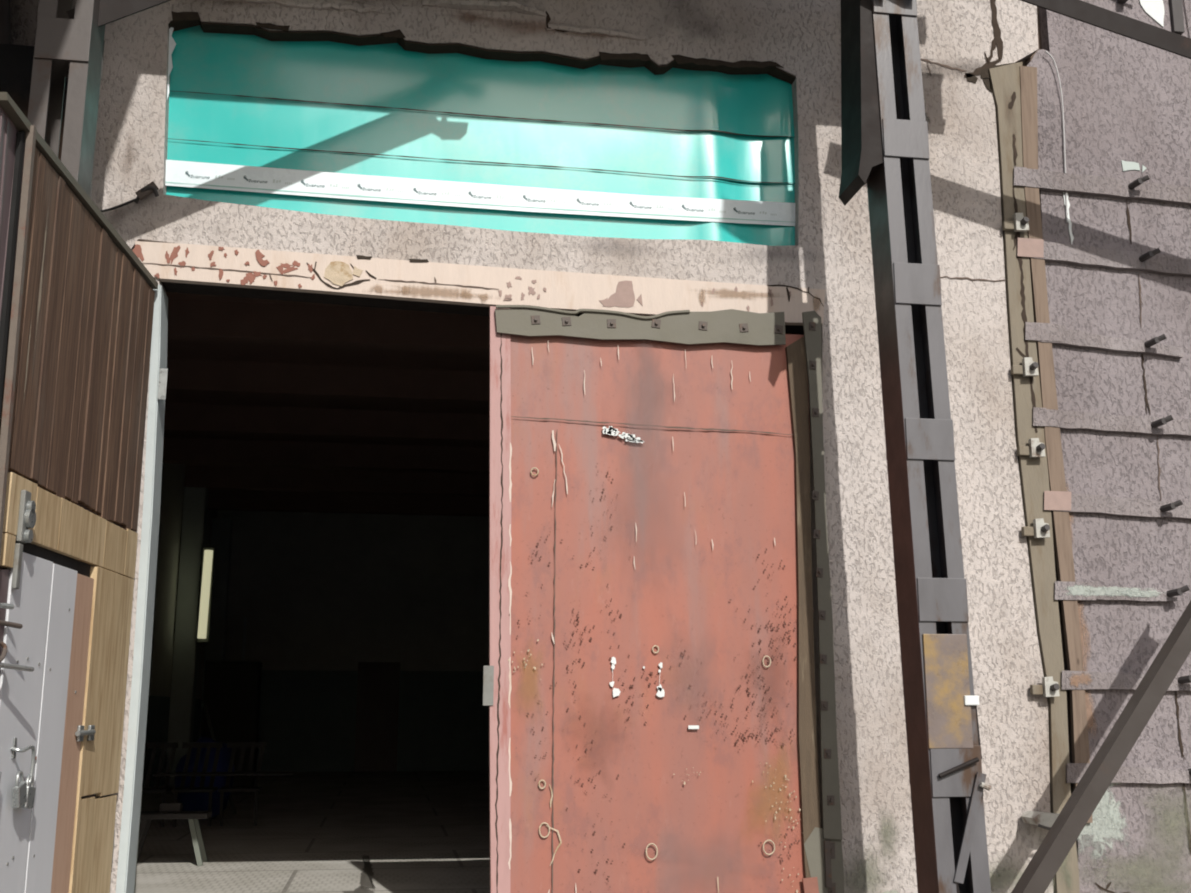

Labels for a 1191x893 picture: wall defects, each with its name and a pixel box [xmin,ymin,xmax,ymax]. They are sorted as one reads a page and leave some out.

crack [546,11,568,32]
crack [921,0,1003,77]
peeling [132,244,144,262]
peeling [154,246,195,279]
crack [940,92,1038,432]
peeling [498,276,546,301]
peeling [599,280,643,308]
water stain [1079,783,1128,857]